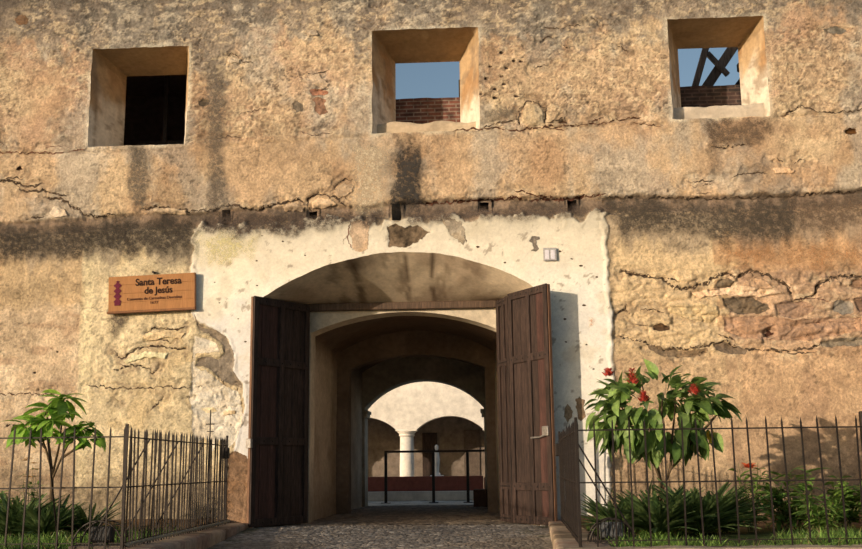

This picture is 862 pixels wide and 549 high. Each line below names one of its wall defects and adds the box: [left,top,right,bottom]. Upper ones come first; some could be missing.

crack [454,100,663,132]
crack [784,105,862,117]
crack [0,142,86,155]
leakage [0,79,862,261]
crack [0,176,115,220]
spalling [350,220,370,252]
spalling [387,223,429,248]
spalling [442,217,466,245]
crack [621,269,862,302]
crack [615,304,858,357]
spalling [648,278,862,358]
spalling [189,314,252,528]